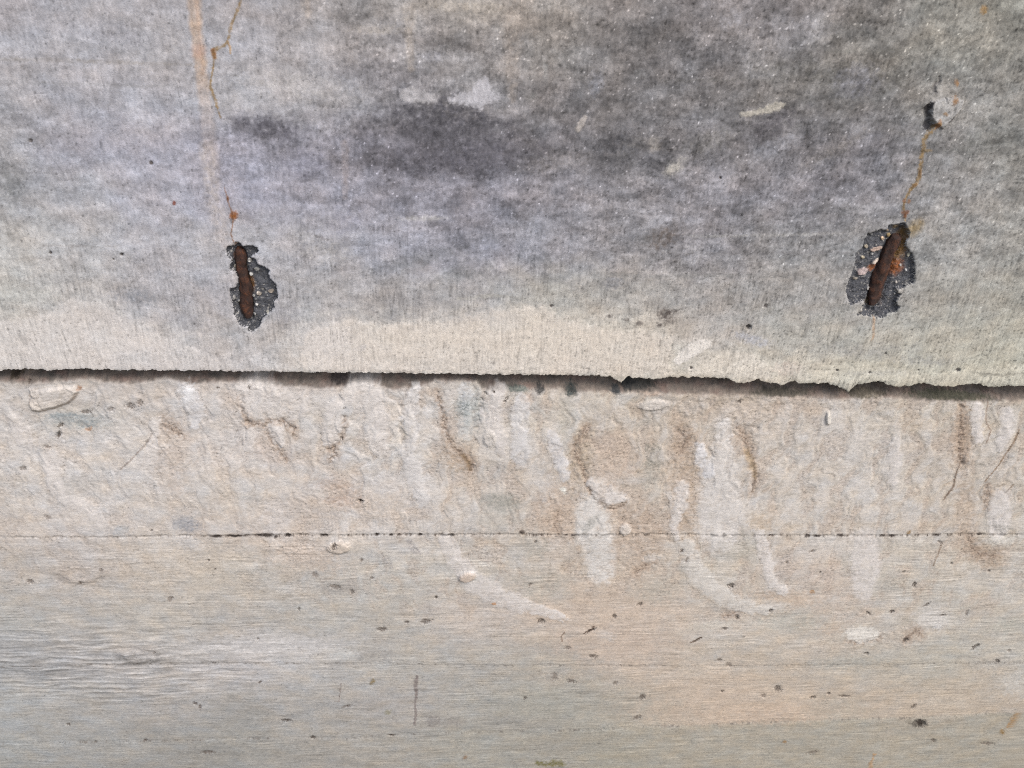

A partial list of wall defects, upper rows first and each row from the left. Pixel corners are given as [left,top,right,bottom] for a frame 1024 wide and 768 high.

crack [208,0,243,120]
crack [899,77,960,223]
crack [223,186,239,245]
spalling [226,242,278,332]
spalling [845,222,916,319]